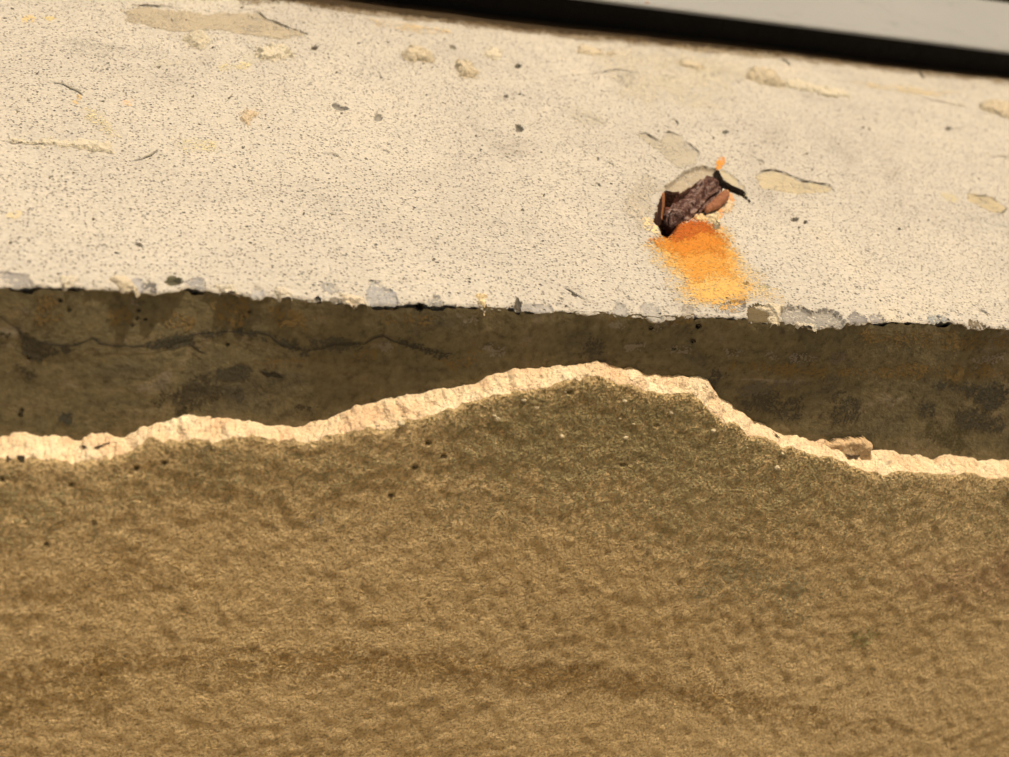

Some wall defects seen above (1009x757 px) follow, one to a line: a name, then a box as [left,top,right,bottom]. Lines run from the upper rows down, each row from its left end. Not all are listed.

spalling [622,165,748,238]
rust [640,192,805,313]
peeling [0,270,33,289]
peeling [132,276,204,294]
peeling [366,280,399,307]
peeling [415,295,442,312]
peeling [514,296,553,313]
peeling [715,281,884,329]
crack [0,315,452,355]
crack [260,370,284,378]
spalling [0,360,1009,479]
water stain [0,633,912,737]